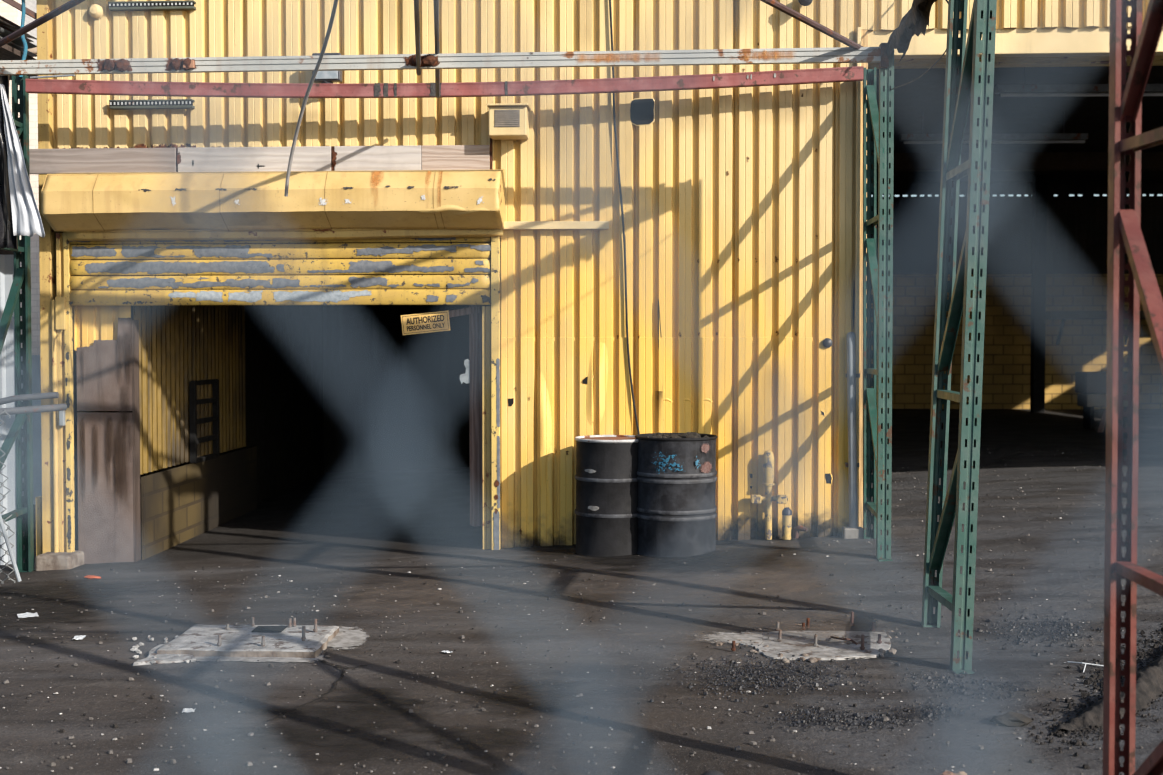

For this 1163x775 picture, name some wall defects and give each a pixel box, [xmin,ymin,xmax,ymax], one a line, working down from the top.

rust [97,59,131,72]
rust [165,58,196,71]
peeling [69,240,156,288]
peeling [130,240,287,305]
peeling [294,237,491,303]
leakage [81,394,133,493]
crack [266,660,430,722]